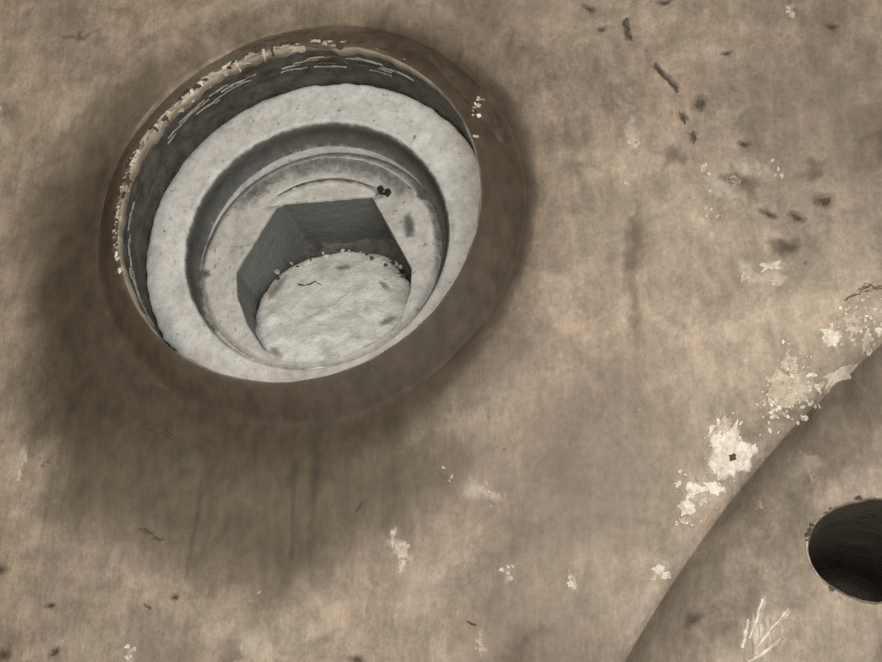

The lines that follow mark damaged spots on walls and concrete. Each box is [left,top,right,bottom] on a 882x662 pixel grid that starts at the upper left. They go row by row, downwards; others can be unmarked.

leakage [35,33,534,588]
spalling [674,296,882,528]
spalling [804,507,836,592]